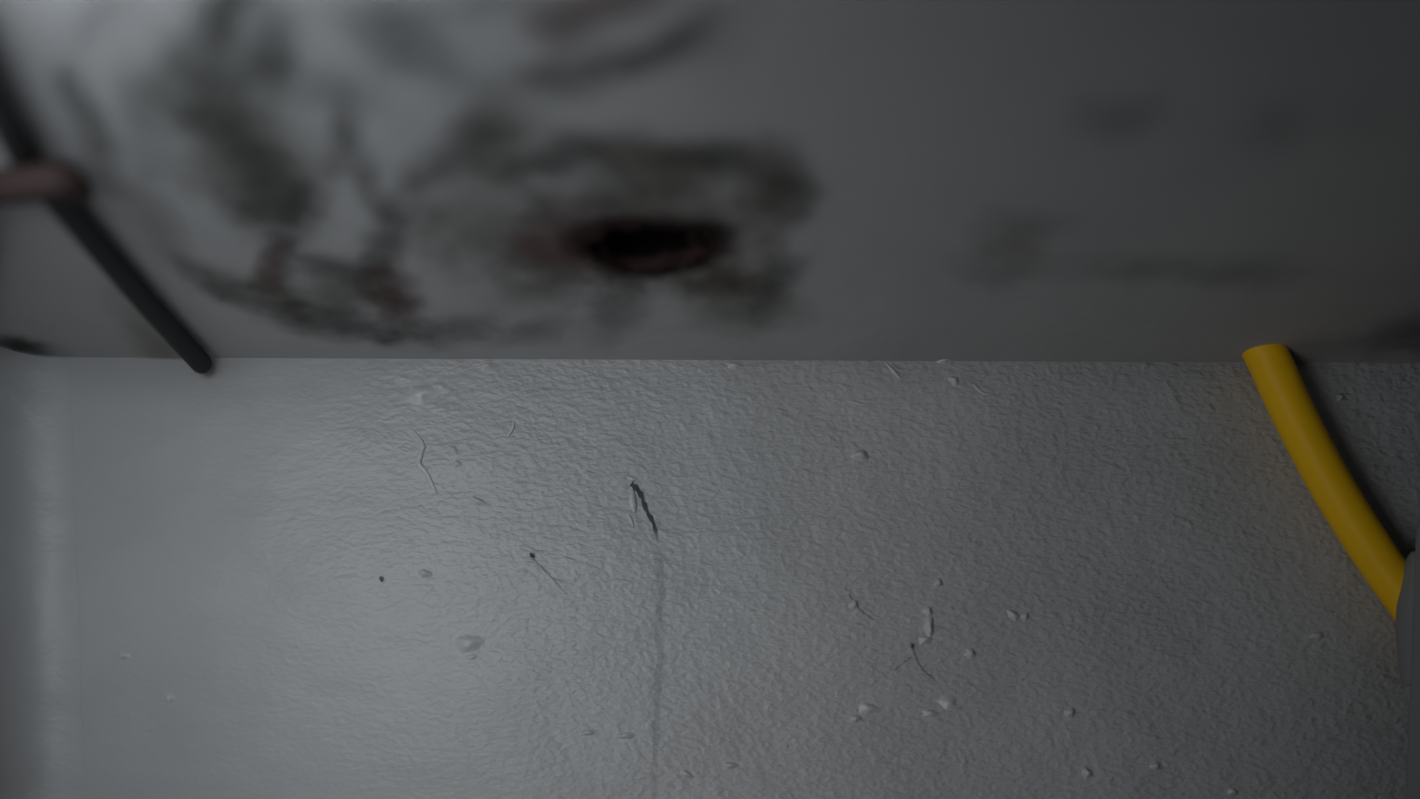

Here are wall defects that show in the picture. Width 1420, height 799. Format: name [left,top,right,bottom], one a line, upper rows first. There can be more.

spalling [566,218,727,277]
crack [627,476,657,533]